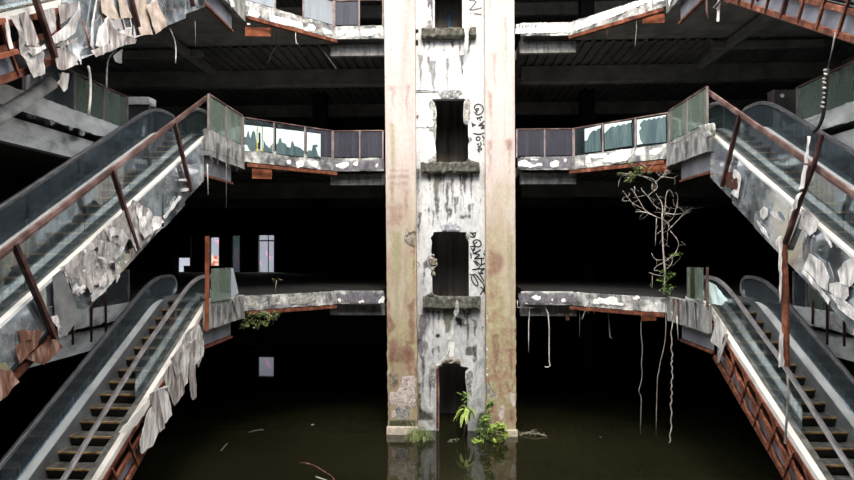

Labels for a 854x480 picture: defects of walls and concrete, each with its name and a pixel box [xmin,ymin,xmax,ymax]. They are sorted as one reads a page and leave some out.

peeling [247,9,384,37]
peeling [416,0,435,45]
peeling [515,0,672,34]
damp [418,41,470,88]
spalling [428,89,471,140]
spalling [440,221,470,241]
peeling [799,208,832,248]
peeling [270,295,316,305]
peeling [593,296,640,306]
peeling [801,253,854,320]
peeling [388,370,416,420]